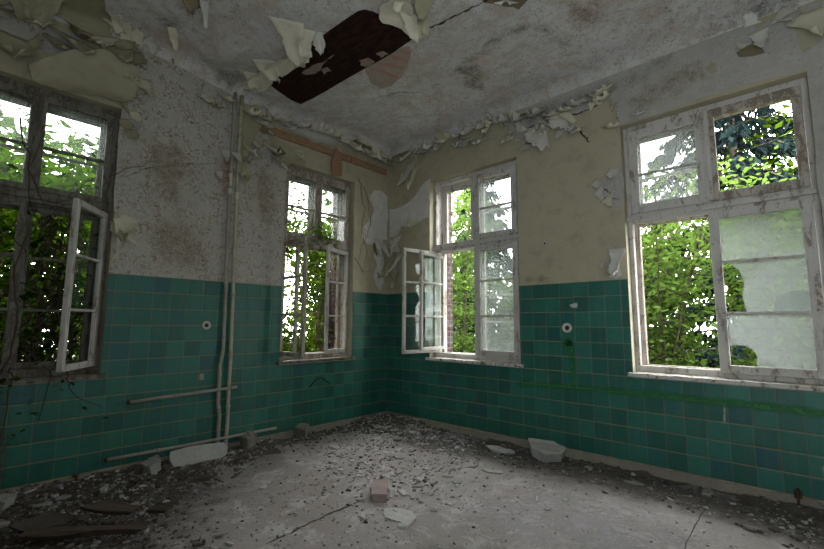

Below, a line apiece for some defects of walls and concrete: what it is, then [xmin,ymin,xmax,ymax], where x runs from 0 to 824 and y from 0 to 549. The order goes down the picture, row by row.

crack [430,1,487,28]
peeling [0,0,824,290]
crack [684,490,716,549]